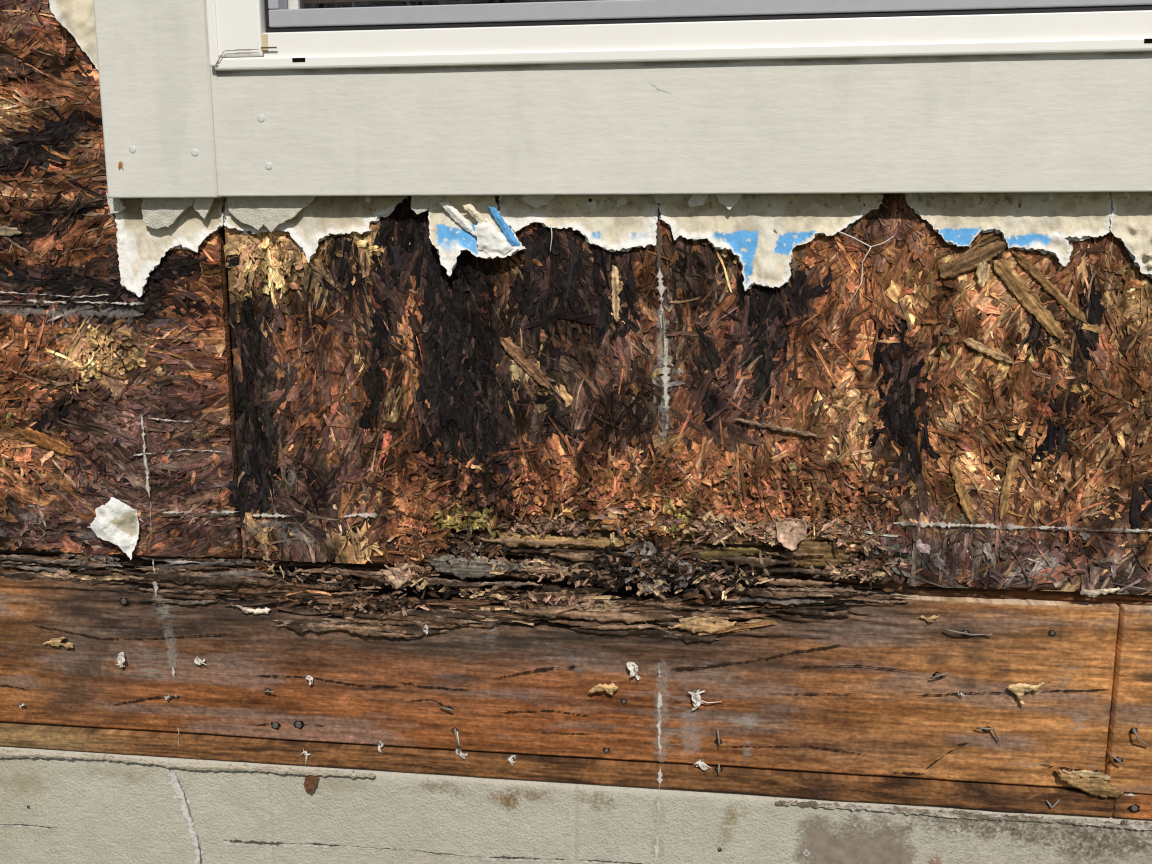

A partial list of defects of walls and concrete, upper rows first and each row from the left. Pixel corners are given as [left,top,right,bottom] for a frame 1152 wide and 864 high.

flaking render [106,193,126,214]
flaking render [141,196,315,232]
flaking render [410,196,443,215]
flaking render [522,195,555,208]
flaking render [652,194,741,210]
water stain [332,201,510,516]
water stain [514,223,640,350]
water stain [736,266,833,404]
water stain [1070,278,1104,366]
water stain [228,296,287,527]
water stain [869,315,942,513]
water stain [1031,389,1070,477]